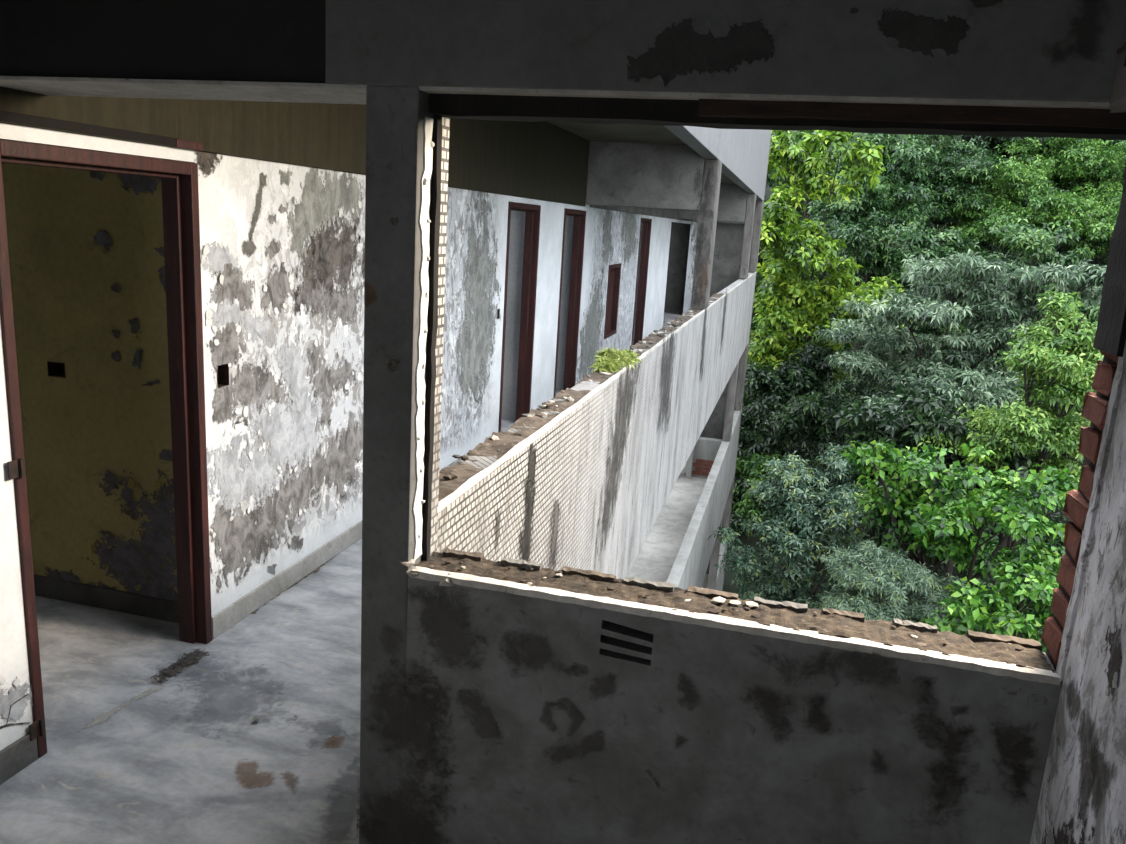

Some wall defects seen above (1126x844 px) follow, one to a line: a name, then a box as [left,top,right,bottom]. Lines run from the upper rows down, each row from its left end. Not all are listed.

peeling [627,17,775,91]
peeling [877,0,1009,61]
flaking render [195,151,223,177]
peeling [200,167,364,594]
damp [657,324,676,434]
damp [596,347,640,556]
damp [519,443,536,562]
damp [549,499,561,570]
damp [501,633,615,699]
damp [540,697,604,763]
damp [807,696,830,734]
damp [1060,680,1116,827]